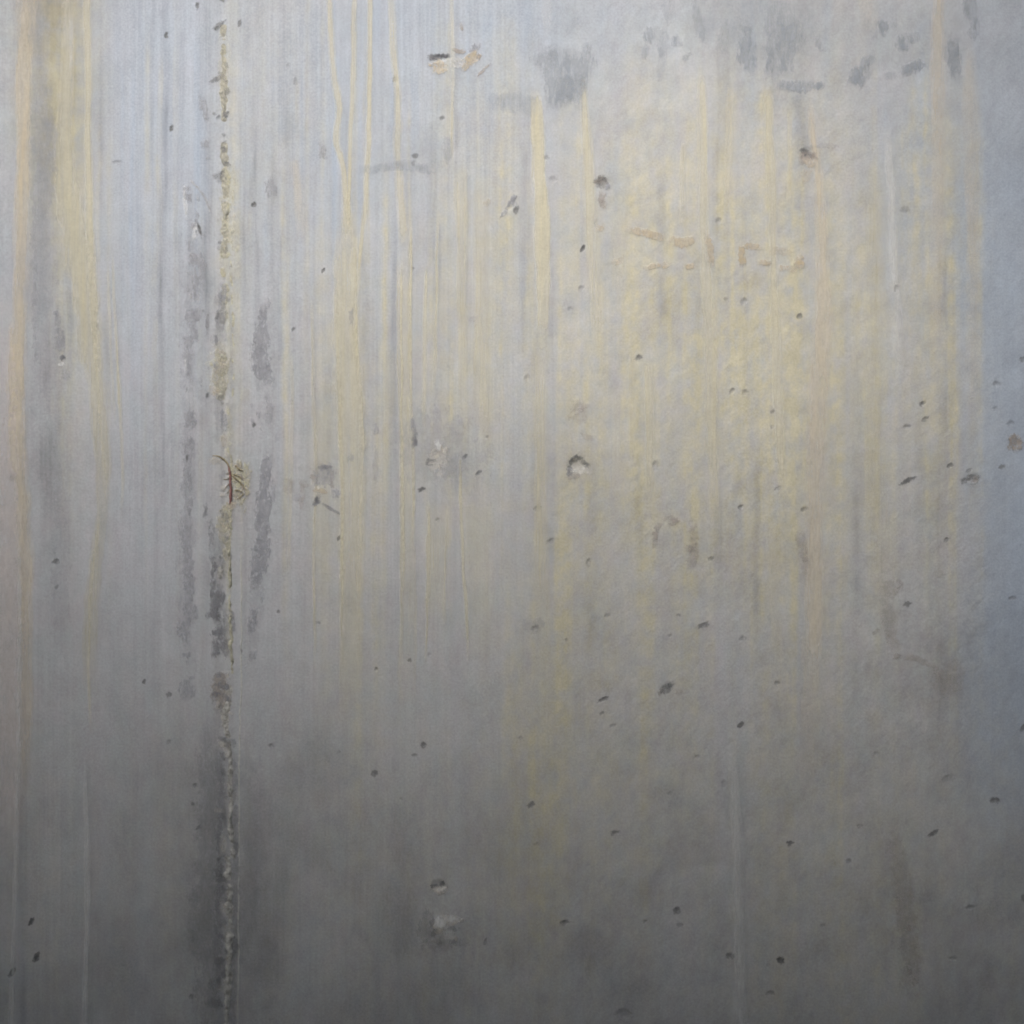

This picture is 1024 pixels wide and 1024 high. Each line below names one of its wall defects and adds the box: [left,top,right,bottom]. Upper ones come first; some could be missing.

spalling [427,44,489,77]
leakage [0,10,32,636]
leakage [54,65,107,471]
crack [205,313,219,344]
leakage [250,306,272,380]
leakage [531,98,550,321]
leakage [250,457,271,584]